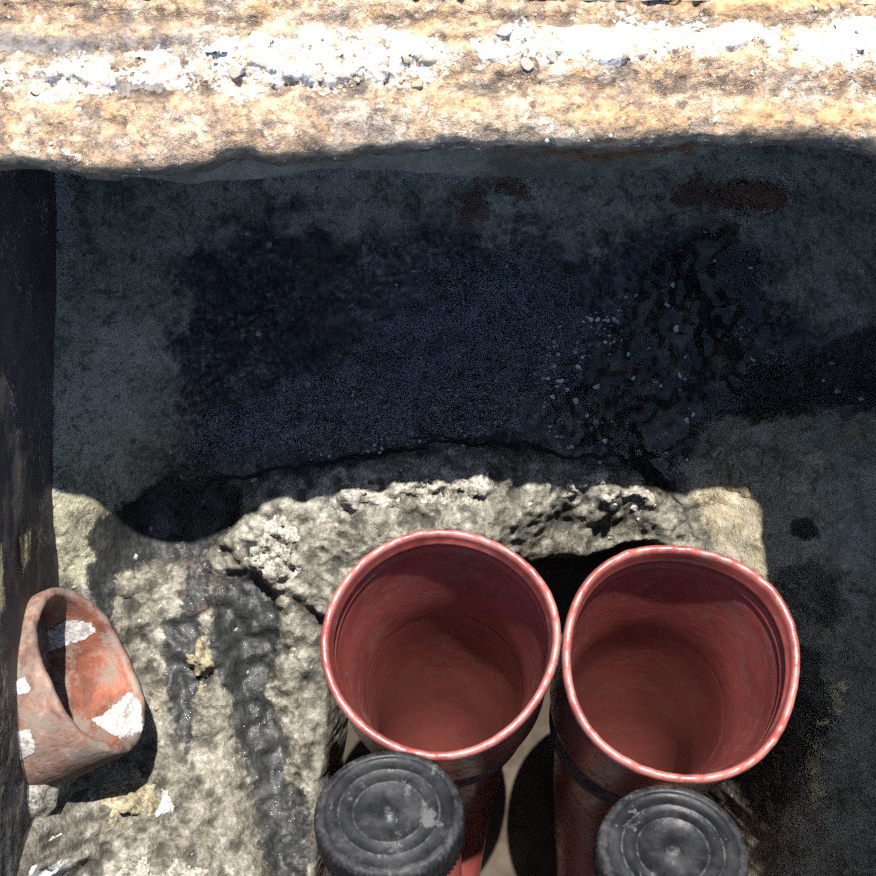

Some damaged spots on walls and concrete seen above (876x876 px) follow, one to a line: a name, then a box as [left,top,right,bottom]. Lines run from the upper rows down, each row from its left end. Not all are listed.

water stain [86,474,242,638]
crack [184,434,683,505]
water stain [556,224,876,500]
water stain [162,540,307,876]